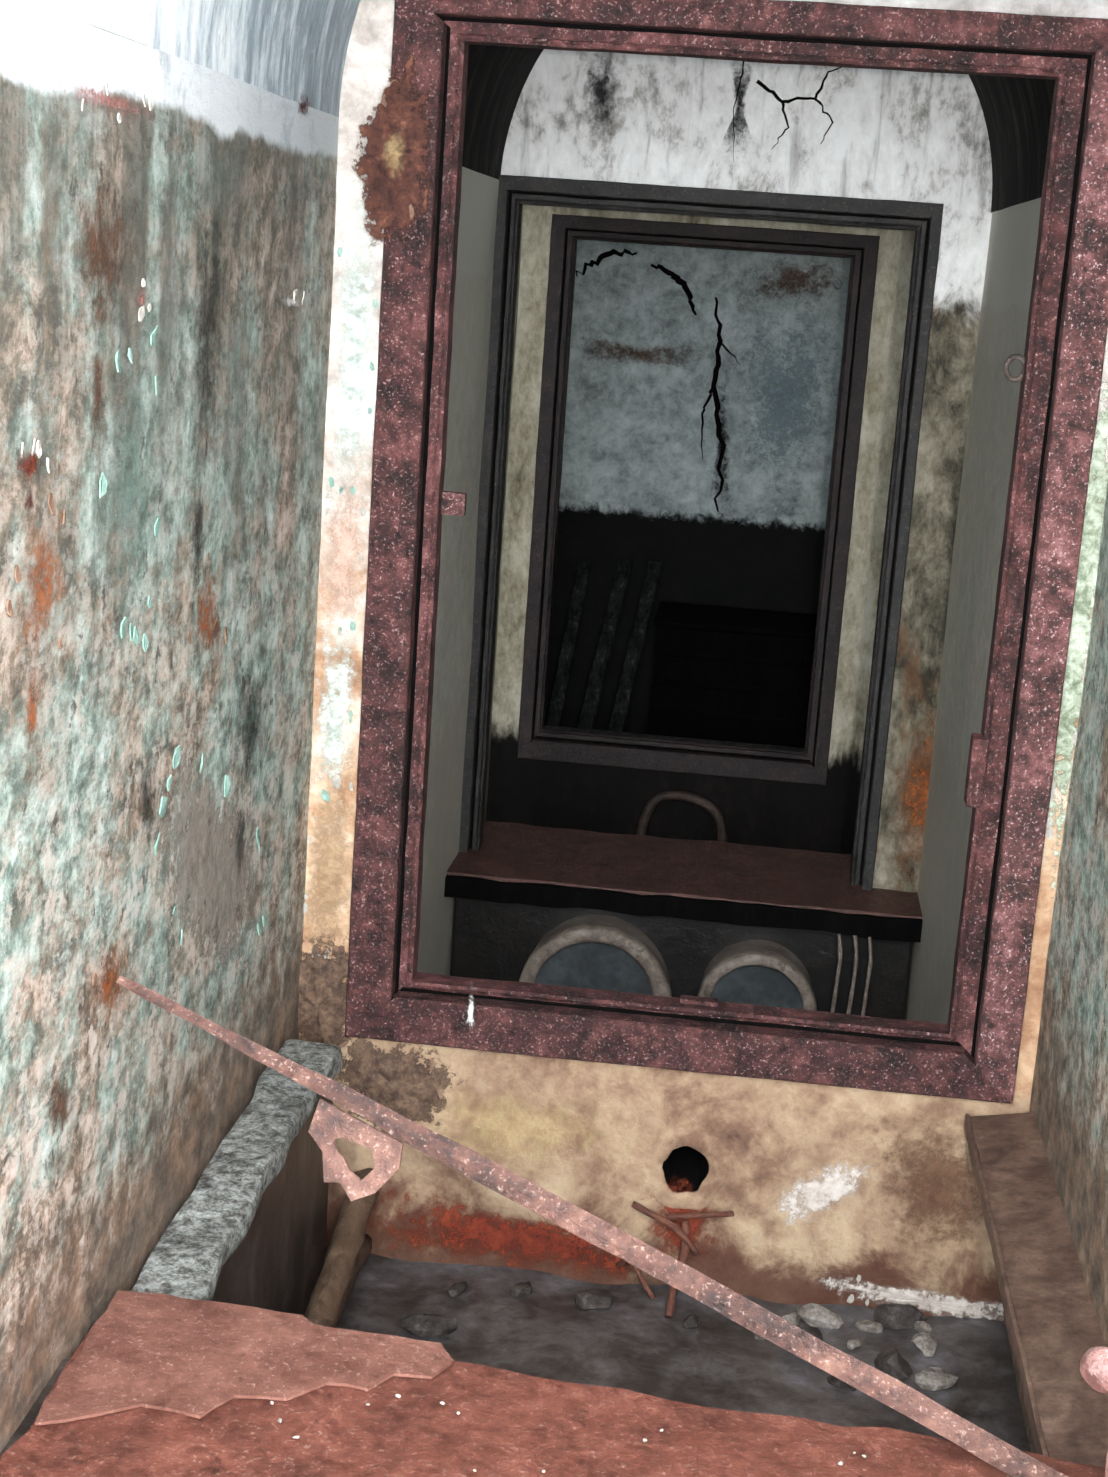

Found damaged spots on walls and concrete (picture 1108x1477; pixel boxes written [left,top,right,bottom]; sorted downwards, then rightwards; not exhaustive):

crack [733,61,842,161]
crack [576,249,741,512]
corrosion [371,1191,629,1279]
corrosion [652,1182,712,1253]
water stain [780,1165,869,1225]